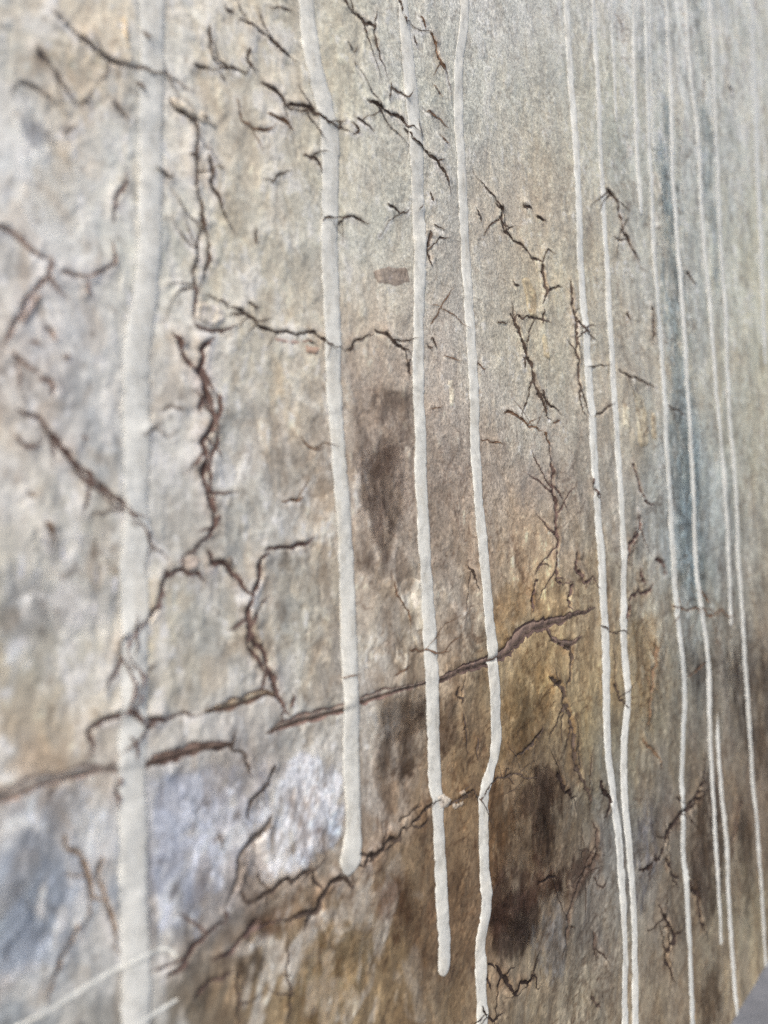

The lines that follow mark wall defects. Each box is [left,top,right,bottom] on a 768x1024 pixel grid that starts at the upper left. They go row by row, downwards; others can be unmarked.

crack [0,0,470,809]
crack [150,173,657,1024]
crack [601,463,667,767]
crack [46,834,120,1006]
crack [639,745,708,1002]